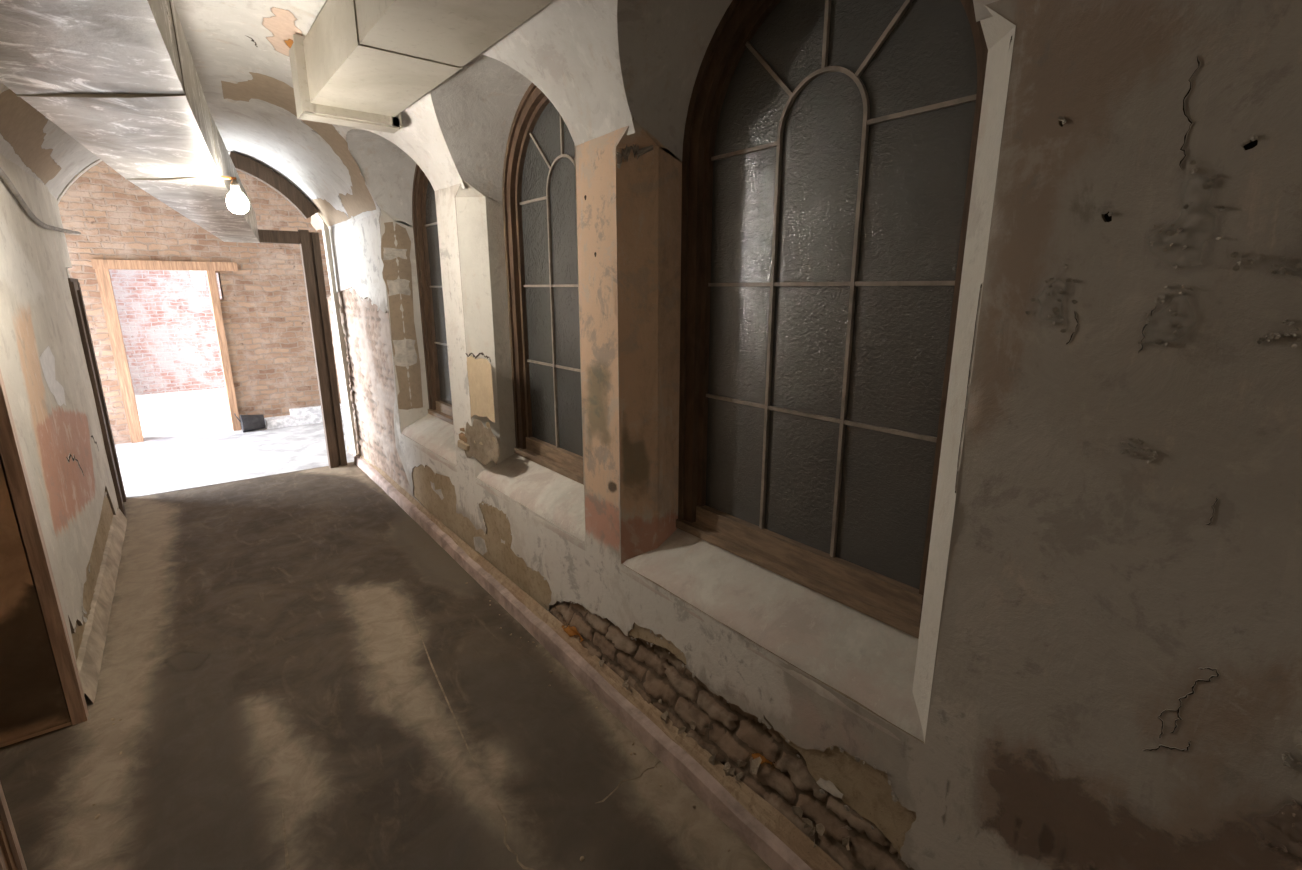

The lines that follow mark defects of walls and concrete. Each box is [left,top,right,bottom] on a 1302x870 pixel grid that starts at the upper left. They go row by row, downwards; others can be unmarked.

peeling [262,7,303,56]
peeling [0,89,61,185]
peeling [221,72,376,230]
spalling [616,144,653,169]
crack [1179,56,1201,170]
flaking render [328,222,916,870]
crack [1142,667,1220,751]